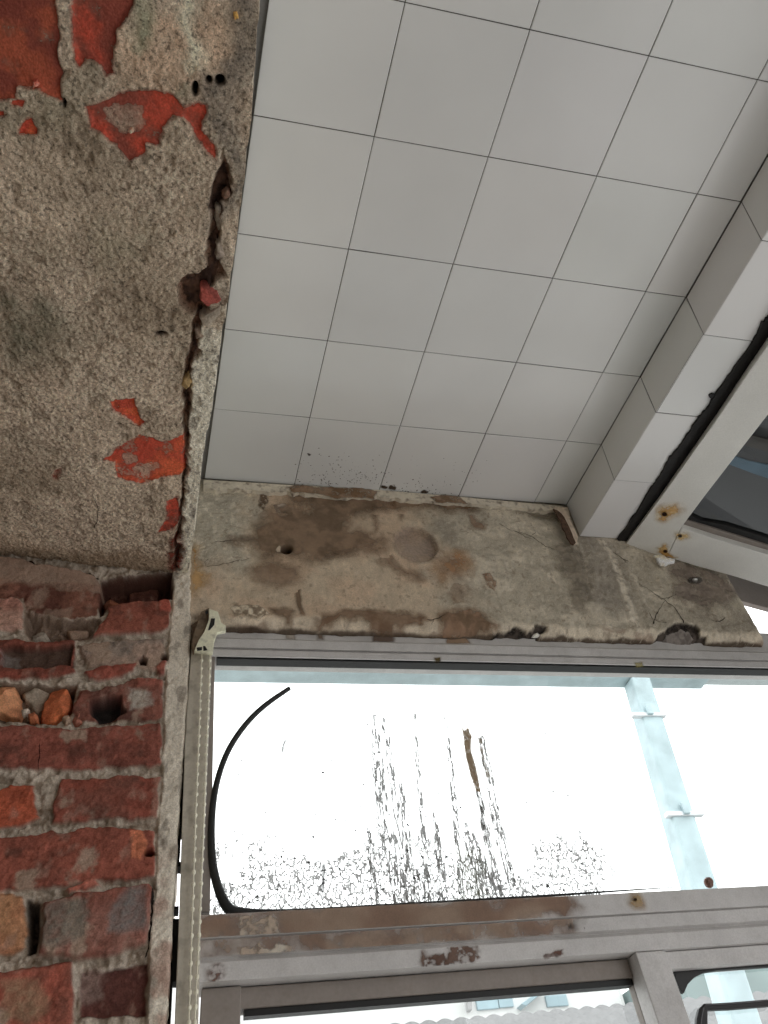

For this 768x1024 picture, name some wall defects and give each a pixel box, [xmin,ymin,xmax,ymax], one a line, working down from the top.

spalling [0,0,133,115]
spalling [87,90,216,160]
crack [182,162,231,437]
spalling [104,398,186,483]
spalling [158,496,186,571]
water stain [230,448,484,642]
corrosion [659,506,677,521]
crack [615,553,684,624]
spalling [654,624,705,646]
water stain [367,709,517,904]